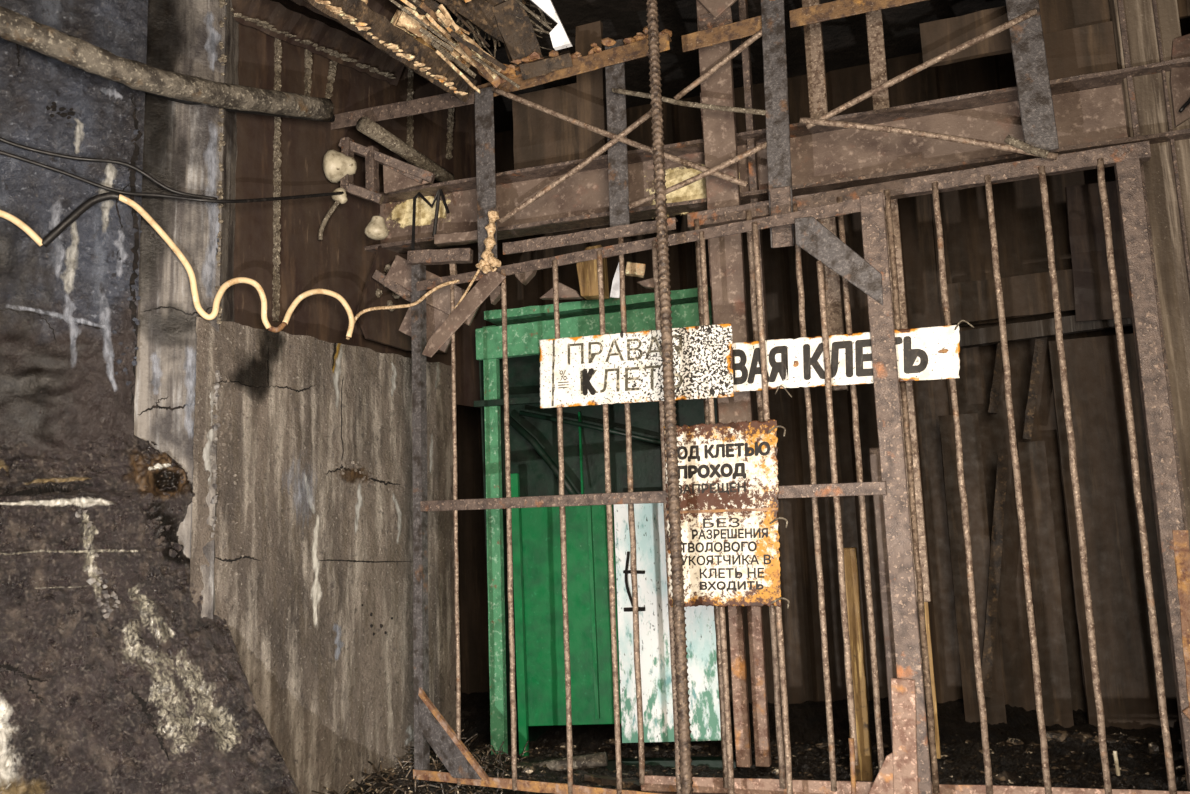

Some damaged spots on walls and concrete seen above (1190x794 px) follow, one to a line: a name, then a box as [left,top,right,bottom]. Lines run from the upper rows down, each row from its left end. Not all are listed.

crack [0,94,236,415]
crack [270,384,315,392]
water stain [332,343,342,407]
crack [326,466,400,485]
water stain [393,496,401,542]
crack [215,555,260,563]
water stain [299,475,321,625]